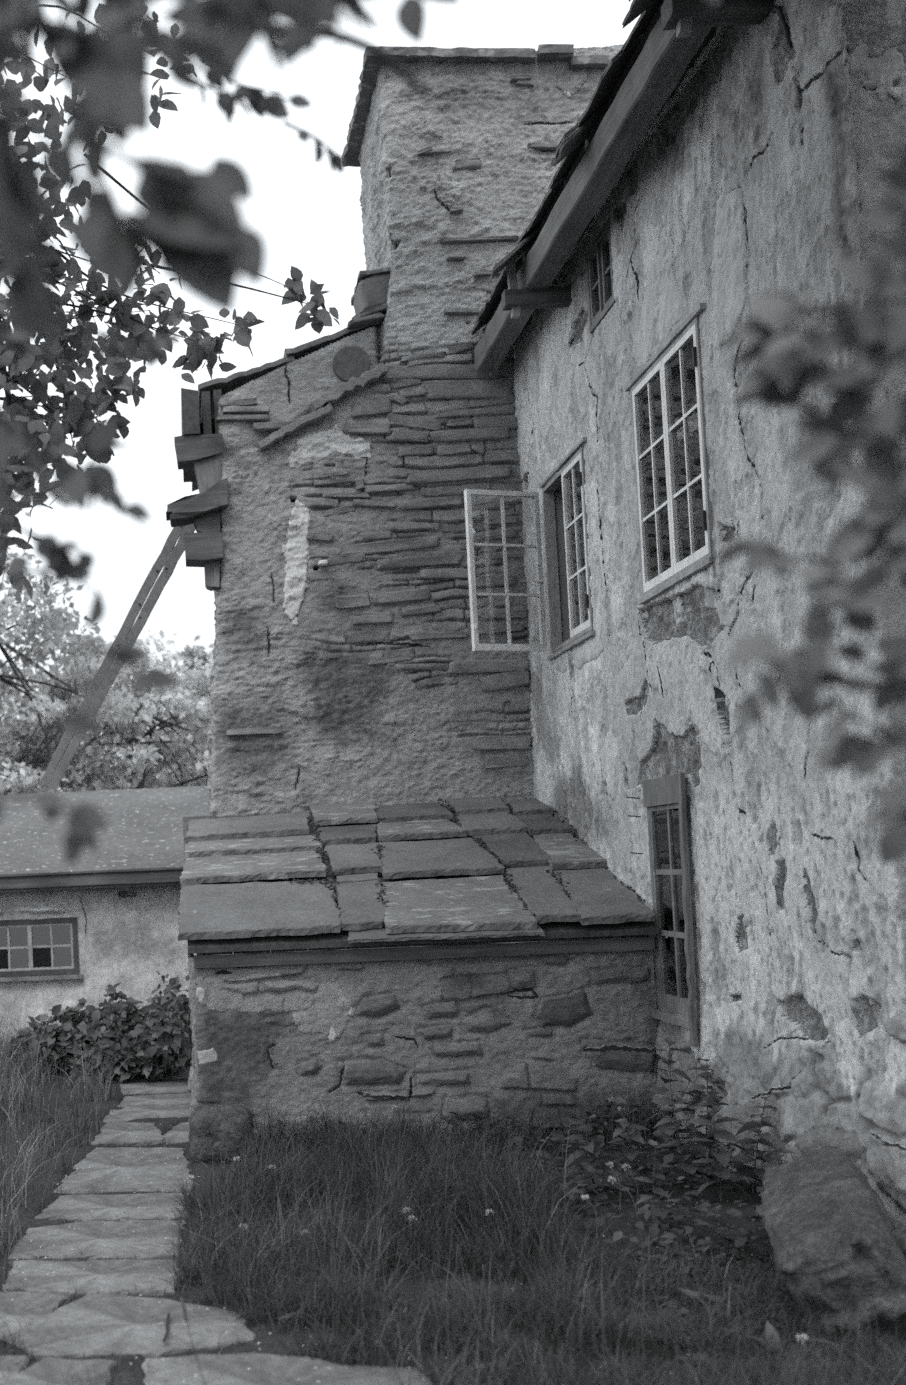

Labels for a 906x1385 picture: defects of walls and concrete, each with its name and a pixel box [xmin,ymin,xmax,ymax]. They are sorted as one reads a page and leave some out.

crack [727,49,844,312]
crack [733,344,764,519]
flaking render [637,573,741,655]
flaking render [625,681,702,792]
flaking render [775,995,832,1051]
flaking render [847,987,881,1038]